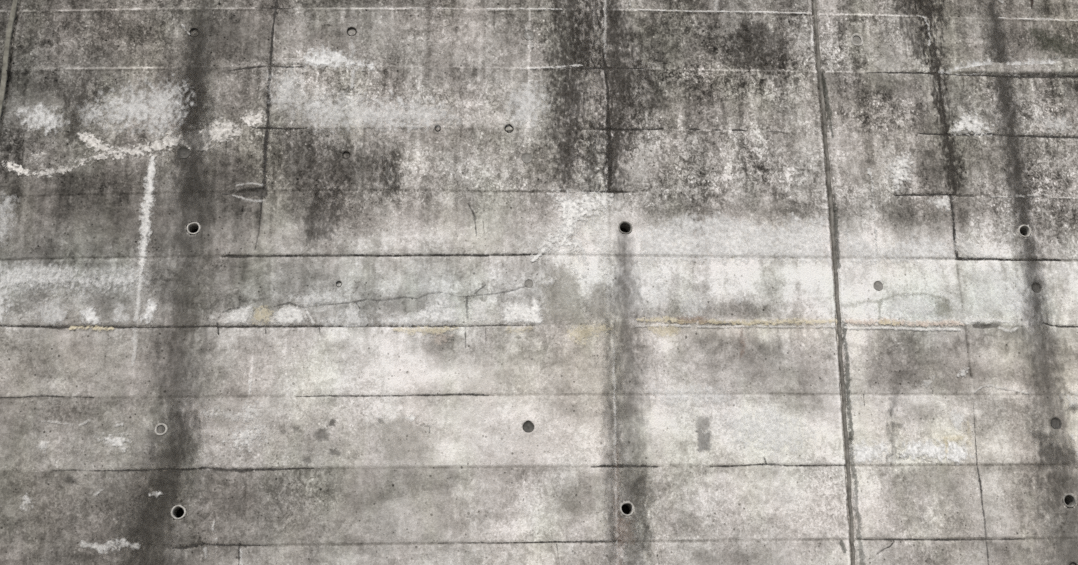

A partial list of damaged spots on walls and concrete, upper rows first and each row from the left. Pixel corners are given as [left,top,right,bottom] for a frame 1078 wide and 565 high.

damp [18,104,62,133]
damp [98,87,181,133]
damp [486,0,829,278]
damp [909,0,994,210]
damp [886,154,913,190]
damp [845,168,952,263]
damp [105,423,125,449]
crack [863,418,1021,555]
damp [81,539,138,553]